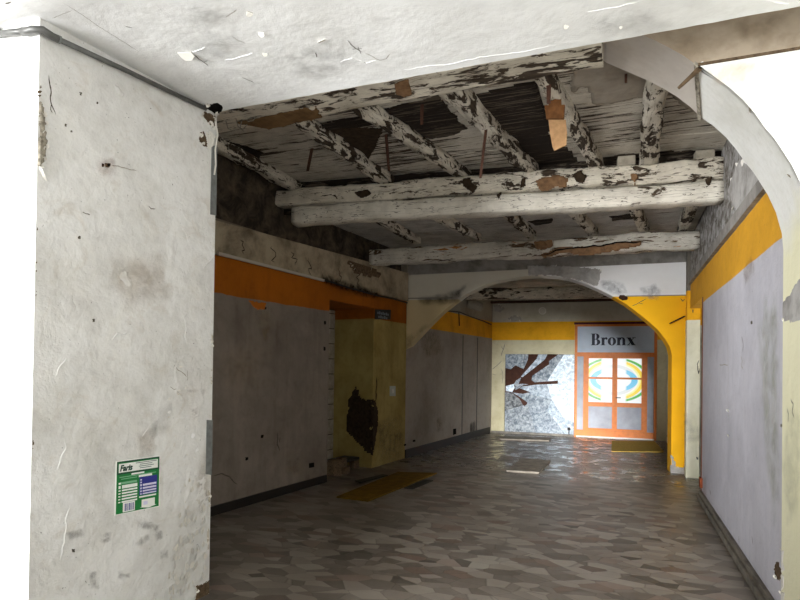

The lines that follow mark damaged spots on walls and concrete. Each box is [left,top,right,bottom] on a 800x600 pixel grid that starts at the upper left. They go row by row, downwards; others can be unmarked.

peeling [384,45,552,139]
flaking render [37,85,49,181]
flaking render [199,103,223,150]
peeling [237,106,383,160]
peeling [476,81,587,191]
peeling [603,153,639,161]
peeling [462,177,477,192]
peeling [528,218,553,226]
peeling [609,213,632,221]
flaking render [782,279,800,323]
peeling [346,387,379,455]
flaking render [773,549,785,600]